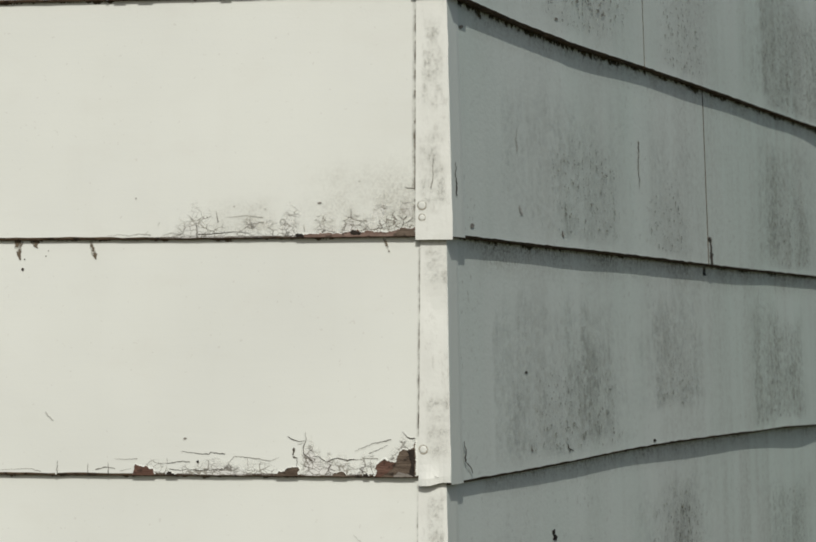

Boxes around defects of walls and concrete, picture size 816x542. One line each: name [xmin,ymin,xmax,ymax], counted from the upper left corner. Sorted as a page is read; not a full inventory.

leakage [458,1,816,134]
peeling [295,226,415,237]
peeling [362,438,418,477]
peeling [132,463,155,475]
peeling [276,466,301,476]